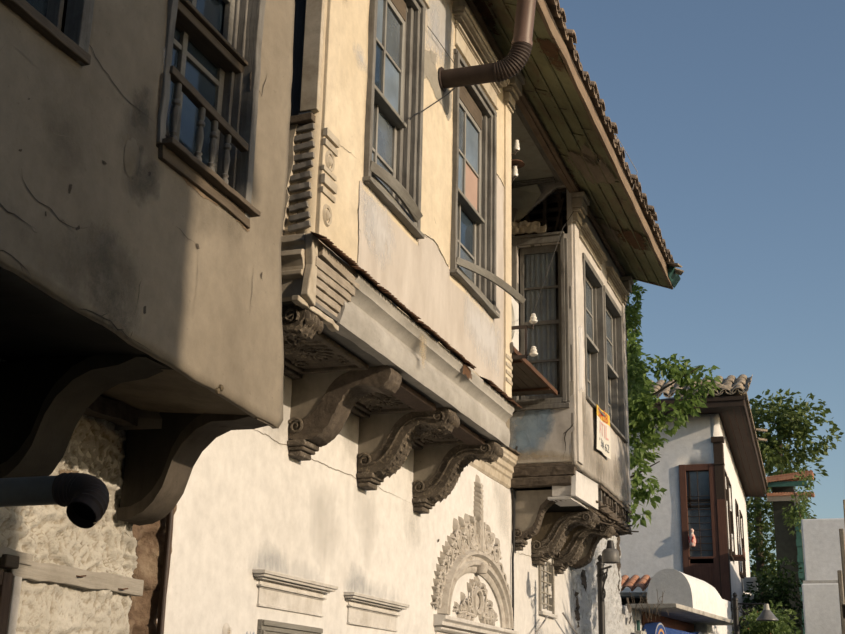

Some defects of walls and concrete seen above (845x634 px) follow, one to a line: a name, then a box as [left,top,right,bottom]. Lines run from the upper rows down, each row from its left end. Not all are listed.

crack [22,178,87,228]
crack [355,183,363,263]